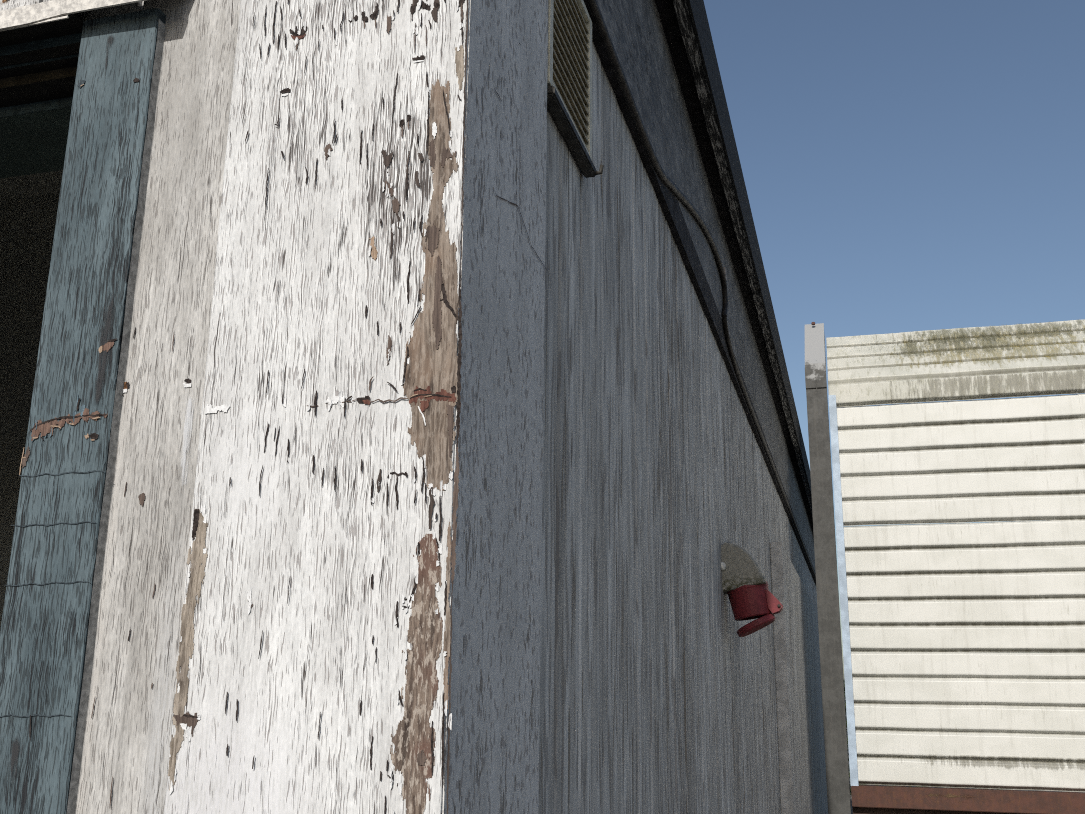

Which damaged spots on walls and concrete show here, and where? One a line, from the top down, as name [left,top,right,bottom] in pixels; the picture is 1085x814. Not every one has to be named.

crack [252,0,319,73]
peeling [322,0,400,45]
crack [414,13,431,87]
crack [259,73,425,496]
peeling [369,0,464,814]
peeling [168,502,208,794]